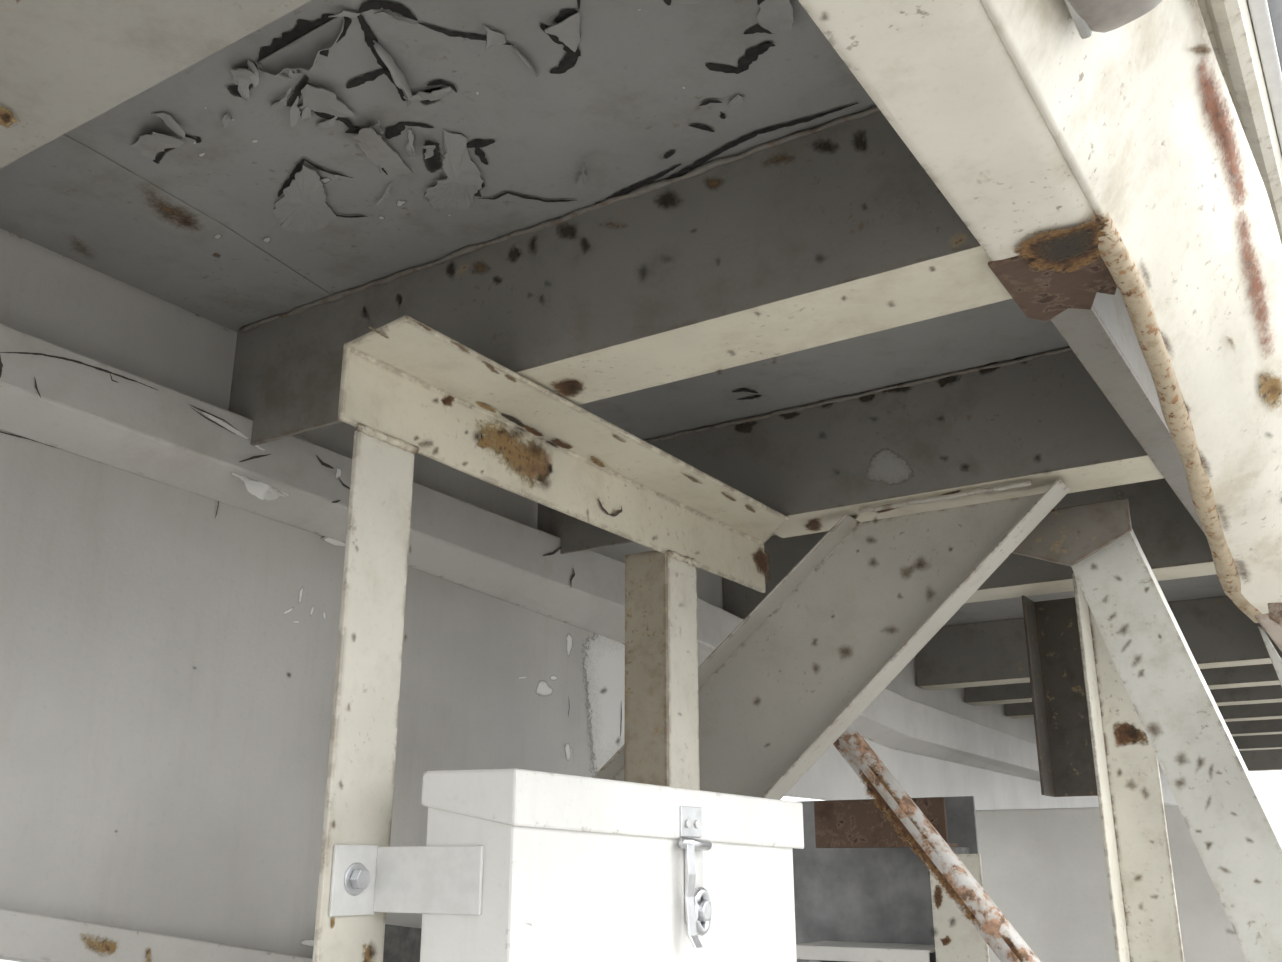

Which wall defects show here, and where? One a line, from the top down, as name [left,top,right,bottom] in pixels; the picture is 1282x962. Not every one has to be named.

peeling [743,0,794,54]
peeling [131,112,205,164]
peeling [227,0,581,233]
crack [385,122,434,139]
crack [480,103,858,204]
corrosion [1193,44,1272,352]
corrosion [1013,215,1111,274]
peeling [231,445,289,500]
corrosion [466,402,572,486]
peeling [566,633,625,777]
corrosion [1114,723,1157,746]
corrosion [859,766,980,945]